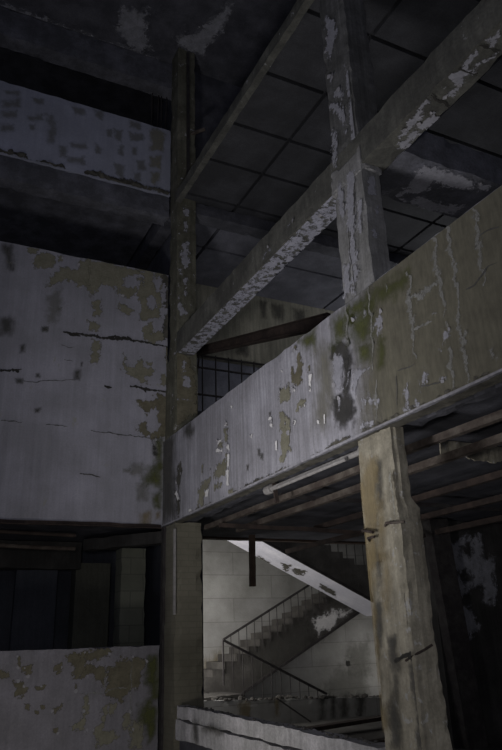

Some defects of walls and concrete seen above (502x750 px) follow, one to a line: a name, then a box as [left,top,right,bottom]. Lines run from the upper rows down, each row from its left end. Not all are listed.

peeling [442,30,501,100]
peeling [397,99,439,149]
crack [0,368,72,383]
peeling [27,247,168,363]
crack [63,331,168,361]
peeling [120,352,166,441]
crack [130,385,166,393]
peeling [177,196,337,431]
water stain [314,306,356,427]
spalling [170,346,502,527]
water stain [405,226,470,388]
peeling [53,648,148,704]